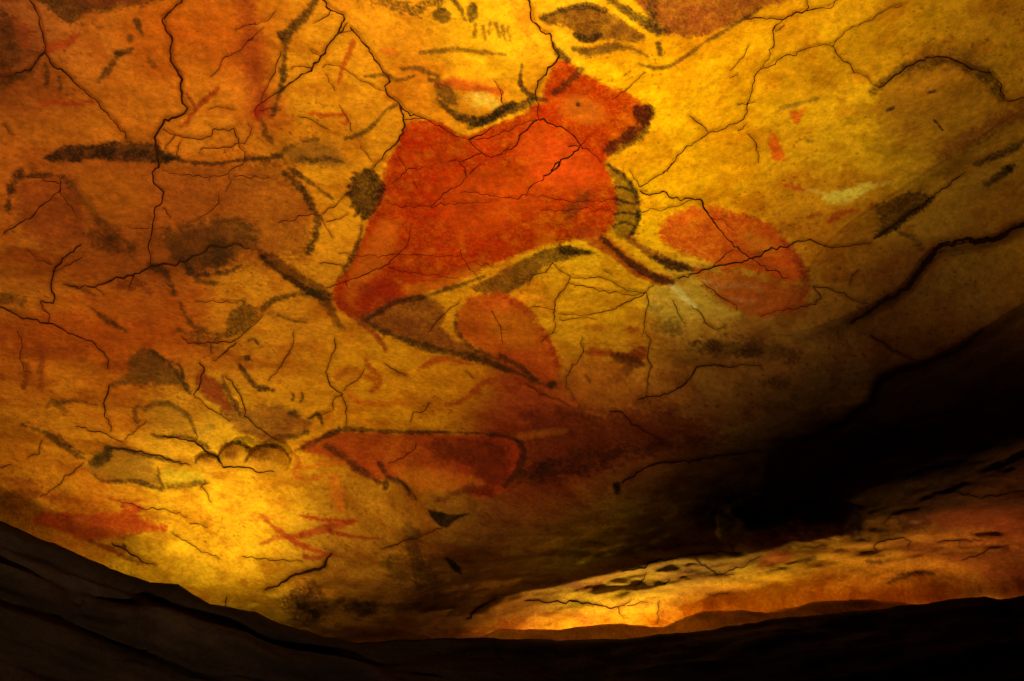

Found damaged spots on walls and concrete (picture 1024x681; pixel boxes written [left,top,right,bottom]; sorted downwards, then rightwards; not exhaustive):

crack [0,0,613,591]
crack [529,0,1024,483]
crack [874,508,916,548]
crack [938,539,1009,561]